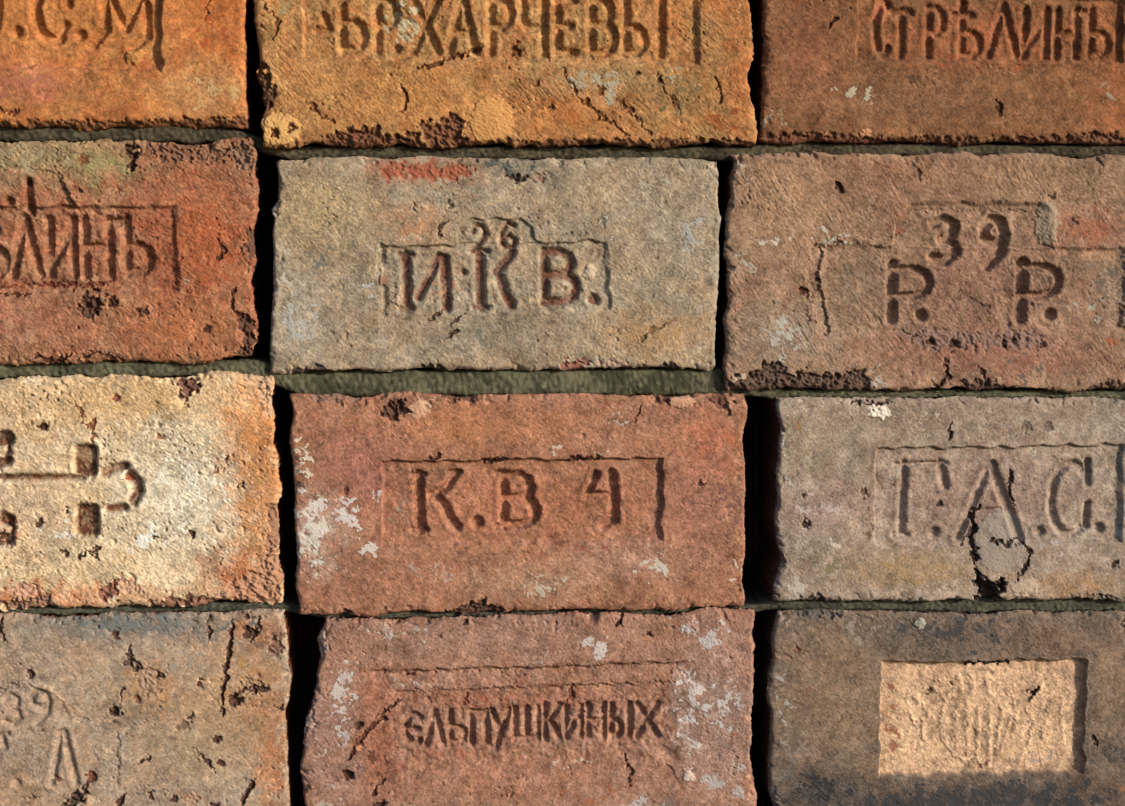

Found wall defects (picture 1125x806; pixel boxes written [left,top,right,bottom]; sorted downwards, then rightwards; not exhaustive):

leakage [292,437,379,582]
leakage [664,616,731,649]
spalling [971,572,1006,600]
leakage [622,656,747,806]